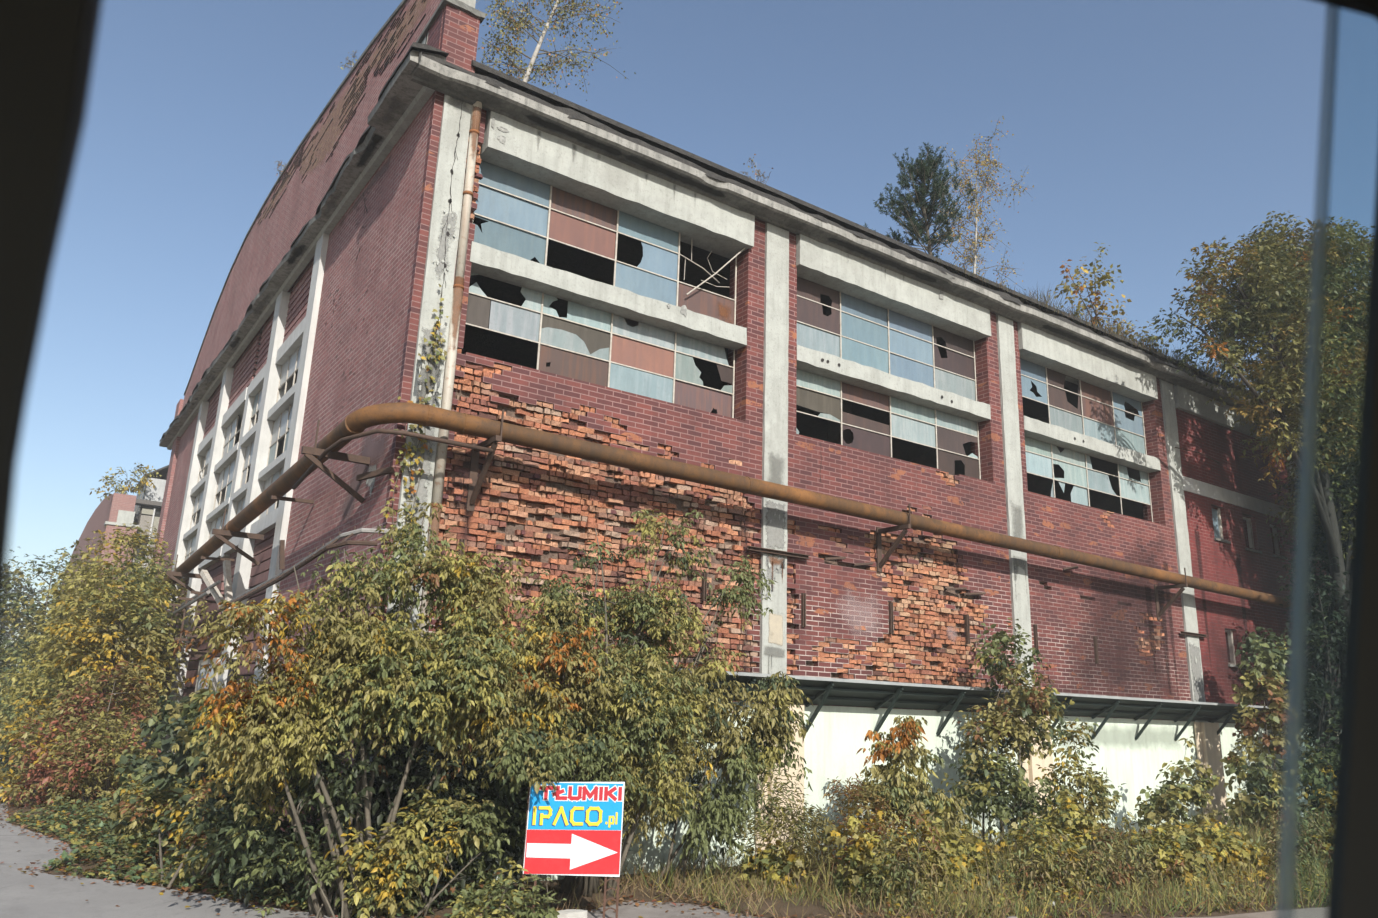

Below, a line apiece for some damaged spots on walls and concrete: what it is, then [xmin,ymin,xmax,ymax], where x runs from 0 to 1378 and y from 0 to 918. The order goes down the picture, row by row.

spalling [258,0,427,225]
spalling [288,245,305,264]
spalling [416,329,677,460]
spalling [394,424,990,694]
spalling [1135,612,1165,664]